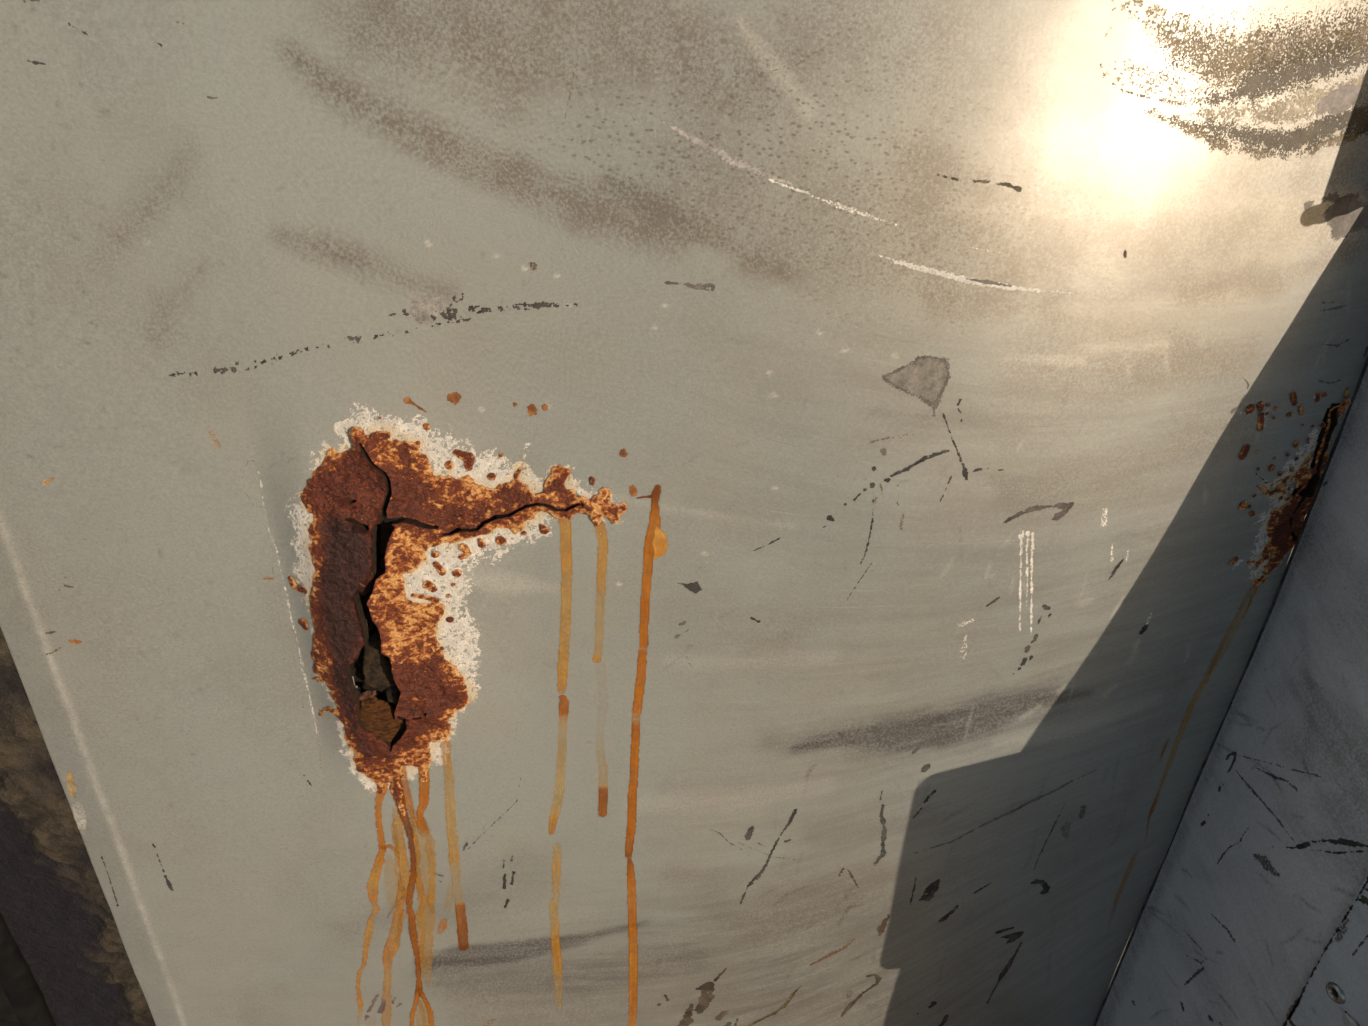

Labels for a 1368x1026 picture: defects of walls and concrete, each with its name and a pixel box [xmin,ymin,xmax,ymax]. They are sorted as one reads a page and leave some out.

rust [263,397,667,1026]
rust [1148,387,1351,823]